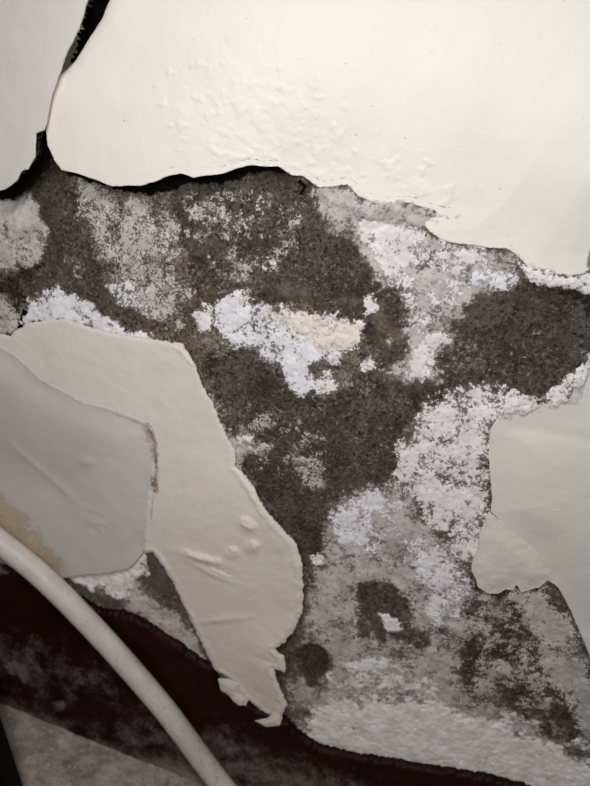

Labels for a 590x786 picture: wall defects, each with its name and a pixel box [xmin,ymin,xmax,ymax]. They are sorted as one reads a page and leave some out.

crack [70,0,110,64]
peeling [0,0,88,282]
damp [426,289,459,309]
damp [444,277,467,296]
damp [408,234,516,277]
damp [360,356,377,373]
peeling [0,166,590,768]
damp [0,503,59,568]
damp [120,580,206,659]